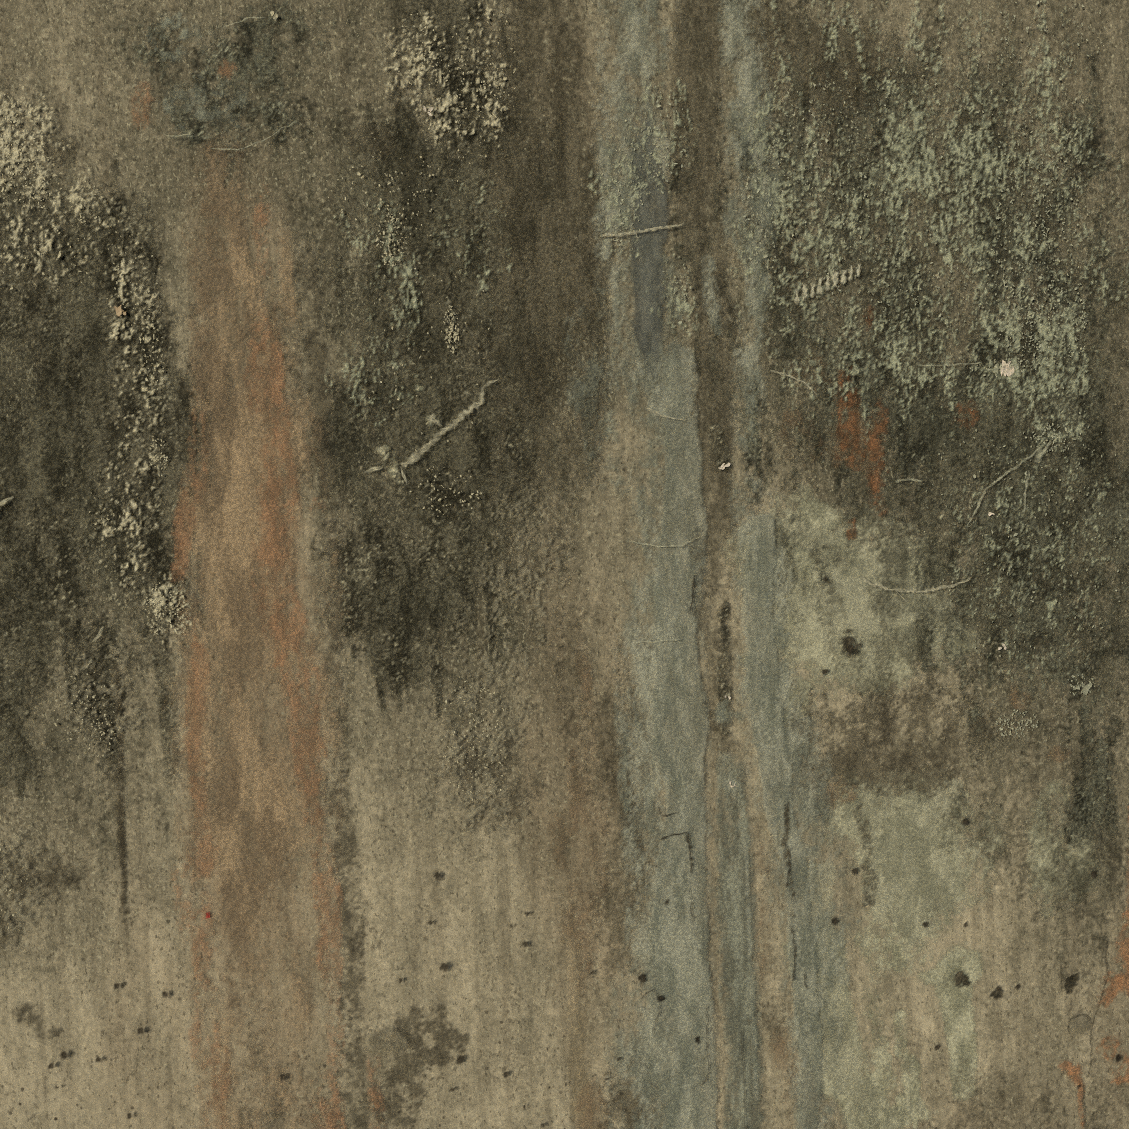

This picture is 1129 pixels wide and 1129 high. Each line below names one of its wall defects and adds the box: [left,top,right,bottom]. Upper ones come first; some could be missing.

leakage [17,1004,60,1039]
leakage [0,844,80,949]
leakage [0,193,214,922]
rust [179,146,335,1129]
leakage [293,0,1129,1129]